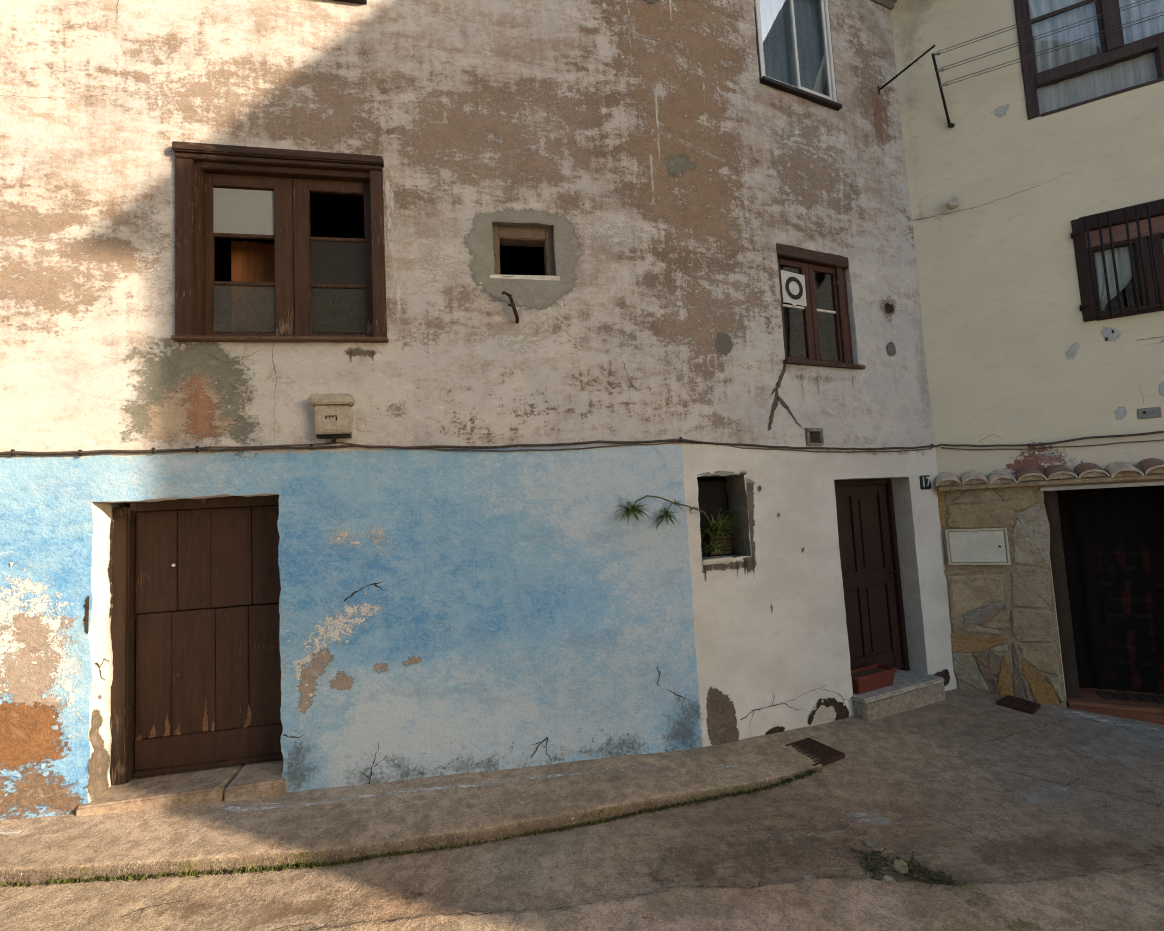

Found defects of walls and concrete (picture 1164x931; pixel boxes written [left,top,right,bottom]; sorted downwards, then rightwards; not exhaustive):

peeling [86,0,895,428]
peeling [0,177,158,333]
peeling [131,369,242,445]
peeling [498,369,673,440]
crack [768,364,804,431]
peeling [1004,440,1082,475]
crack [344,581,388,602]
peeling [0,562,111,820]
spalling [706,687,739,746]
crack [740,685,849,734]
spalling [808,698,849,727]